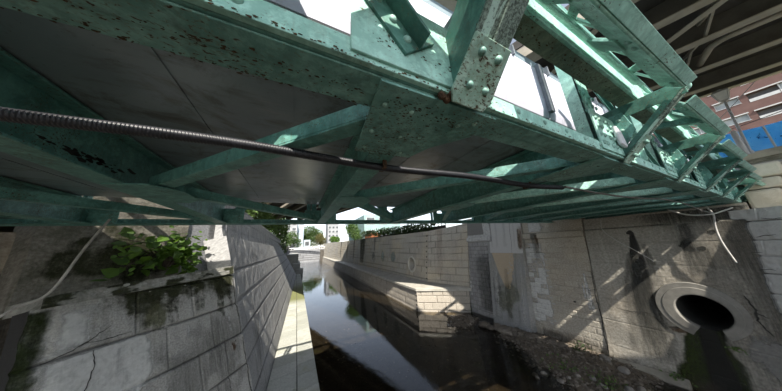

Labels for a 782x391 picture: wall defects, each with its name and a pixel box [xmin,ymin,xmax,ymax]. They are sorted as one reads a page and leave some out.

rust [272,21,442,90]
peeling [466,223,523,289]
water stain [625,234,667,337]
water stain [656,207,742,256]
crack [744,296,774,337]
crack [40,326,132,391]